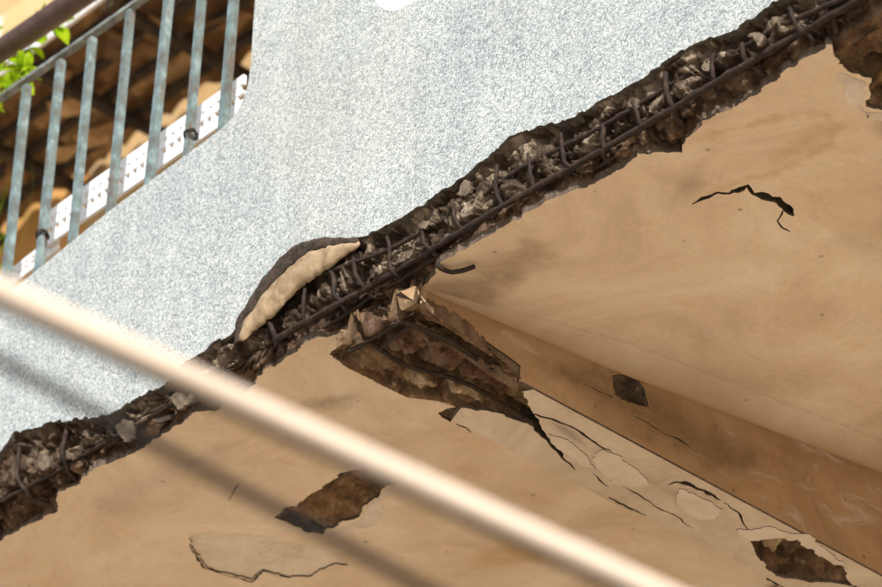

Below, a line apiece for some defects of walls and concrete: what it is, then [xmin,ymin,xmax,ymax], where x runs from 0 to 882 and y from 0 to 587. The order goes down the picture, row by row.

spalling [104,30,123,62]
spalling [46,97,99,118]
spalling [45,121,125,163]
spalling [4,162,27,187]
spalling [191,0,882,426]
crack [699,184,794,213]
spalling [123,386,220,436]
crack [524,407,563,456]
spalling [0,419,139,535]
peeling [548,434,649,488]
spalling [288,471,391,535]
spalling [736,526,848,581]